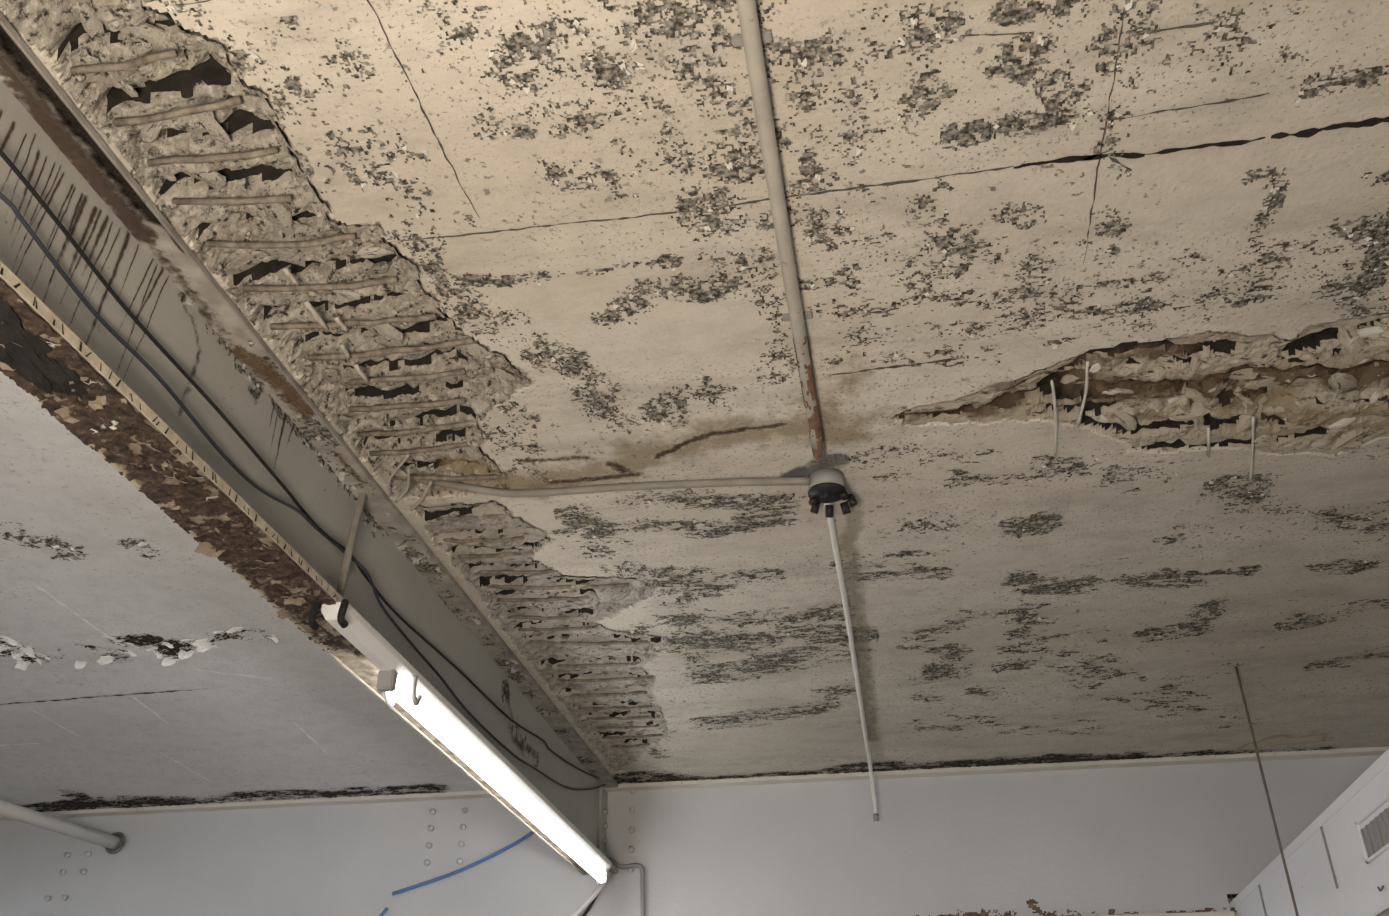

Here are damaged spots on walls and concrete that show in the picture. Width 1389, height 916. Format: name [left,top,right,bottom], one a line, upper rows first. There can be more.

crack [366,0,688,242]
crack [724,9,1389,263]
spalling [757,0,1389,546]
spalling [0,0,879,783]
corrosion [793,336,824,461]
water stain [910,344,1389,418]
water stain [781,454,851,477]
peeling [829,511,960,582]
peeling [894,564,1268,737]
peeling [1271,599,1389,632]
peeling [1305,559,1384,575]
corrosion [916,899,1138,916]